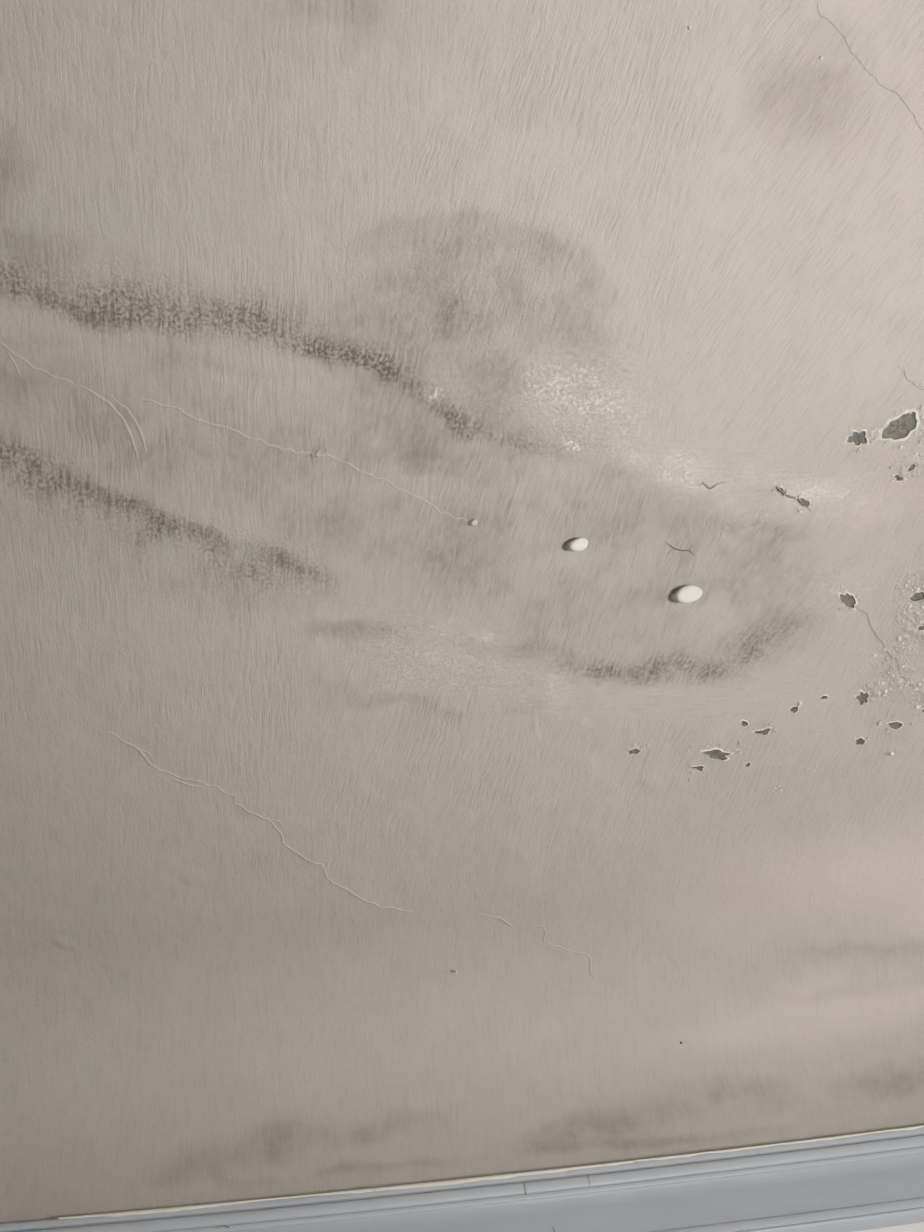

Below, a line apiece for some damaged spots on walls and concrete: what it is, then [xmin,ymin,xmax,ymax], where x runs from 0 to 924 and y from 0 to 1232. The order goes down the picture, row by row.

crack [815,1,924,133]
leakage [213,308,333,358]
crack [0,341,468,522]
leakage [527,358,631,452]
spalling [844,405,924,483]
spalling [772,483,811,513]
spalling [837,586,862,611]
flaking render [854,566,924,735]
spalling [688,744,733,773]
spalling [740,719,778,736]
crack [109,732,415,912]